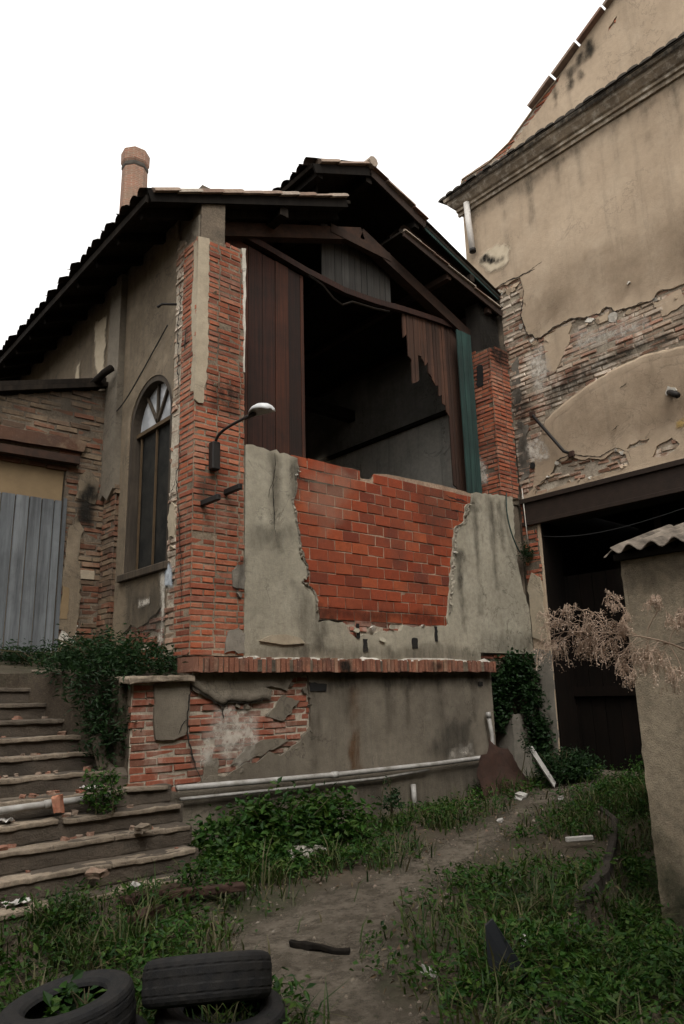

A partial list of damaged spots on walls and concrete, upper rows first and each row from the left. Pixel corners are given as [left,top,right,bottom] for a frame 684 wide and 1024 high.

water stain [569,41,592,87]
water stain [450,65,648,200]
crack [498,262,684,339]
spalling [498,278,684,582]
water stain [78,484,96,523]
spalling [449,502,474,613]
spalling [126,676,315,792]
crack [179,675,272,782]